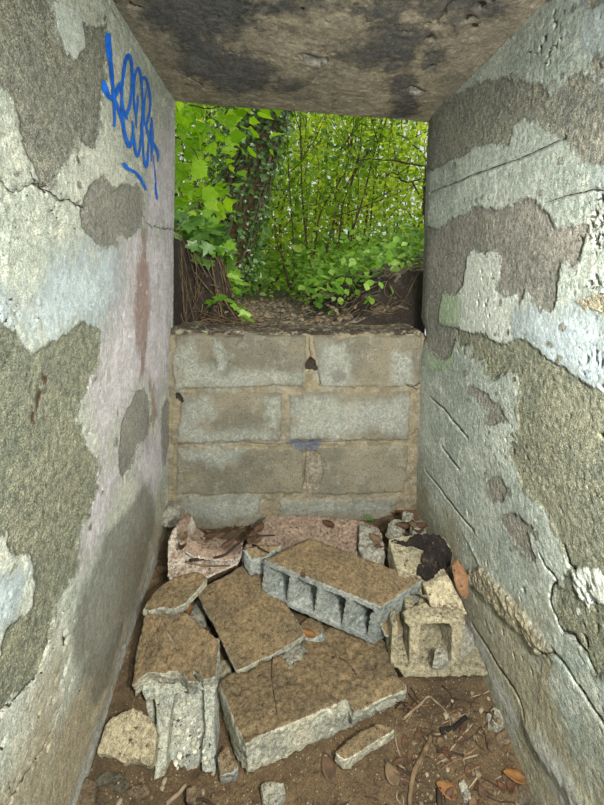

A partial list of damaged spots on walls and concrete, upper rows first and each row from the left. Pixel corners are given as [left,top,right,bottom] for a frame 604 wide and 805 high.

crack [1,171,83,208]
spalling [0,0,108,218]
water stain [139,0,327,95]
water stain [332,0,508,118]
crack [430,138,565,193]
spalling [426,52,604,173]
crack [545,189,604,203]
rust [136,234,148,371]
spalling [116,388,152,477]
spalling [421,189,604,681]
spalling [0,298,104,708]